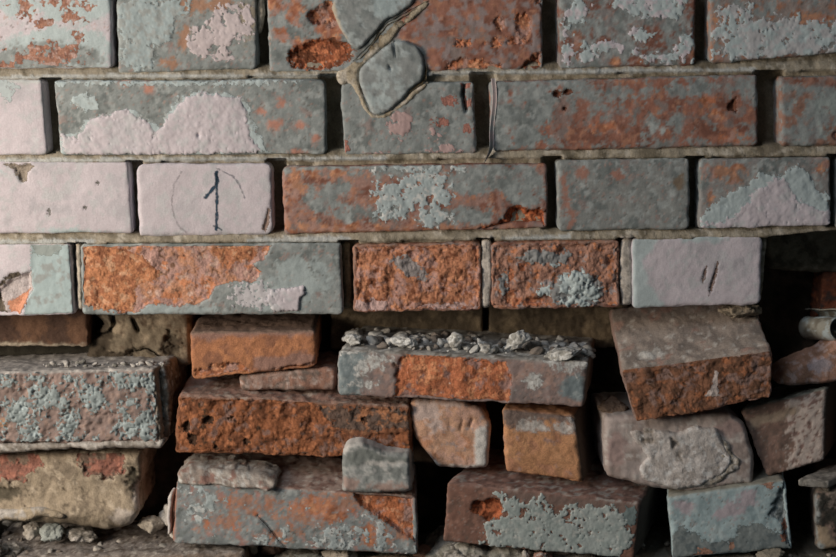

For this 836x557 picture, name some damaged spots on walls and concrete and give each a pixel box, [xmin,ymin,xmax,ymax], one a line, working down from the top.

peeling [55,0,354,155]
peeling [369,165,466,230]
peeling [700,163,830,228]
peeling [0,244,73,315]
spalling [82,245,306,314]
spalling [355,244,481,312]
spalling [492,242,619,308]
peeling [0,370,158,442]
spalling [176,397,410,457]
spalling [392,354,512,401]
spalling [623,351,772,421]
peeling [470,491,638,557]